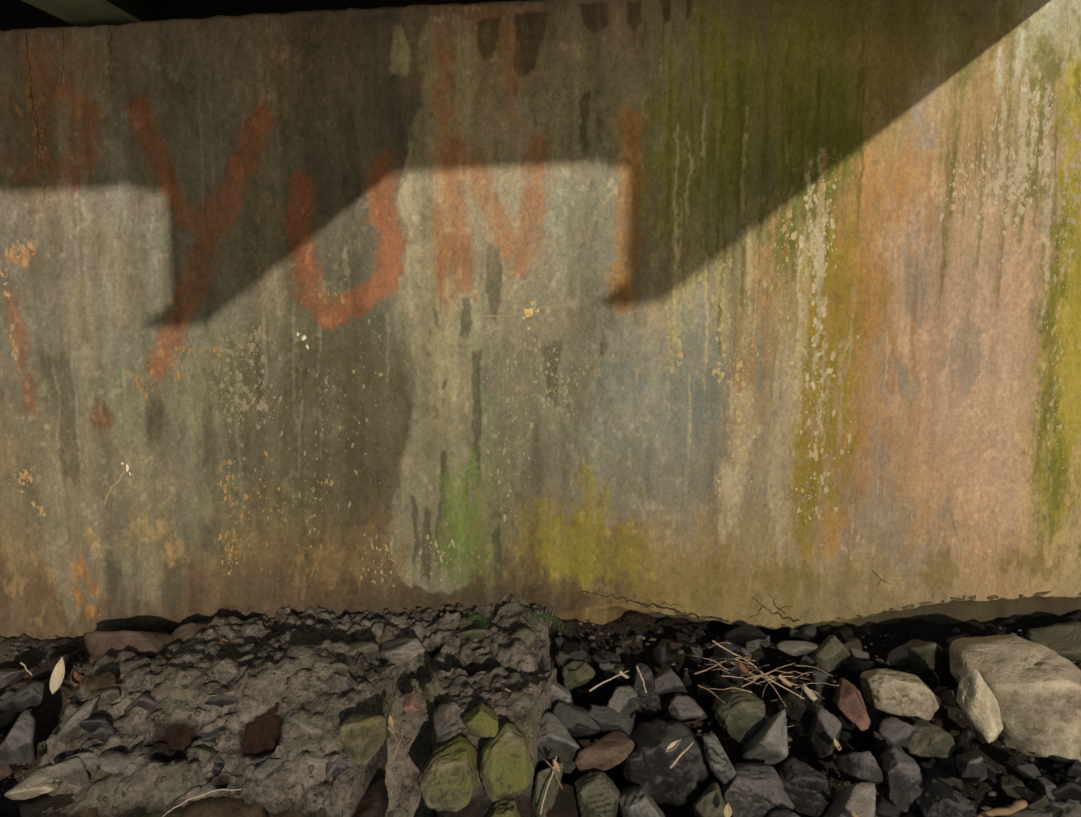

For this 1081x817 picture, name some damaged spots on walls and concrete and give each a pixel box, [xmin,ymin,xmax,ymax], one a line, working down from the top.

water stain [0,0,973,641]
water stain [901,202,1000,407]
water stain [989,0,1081,361]
crack [580,591,800,622]